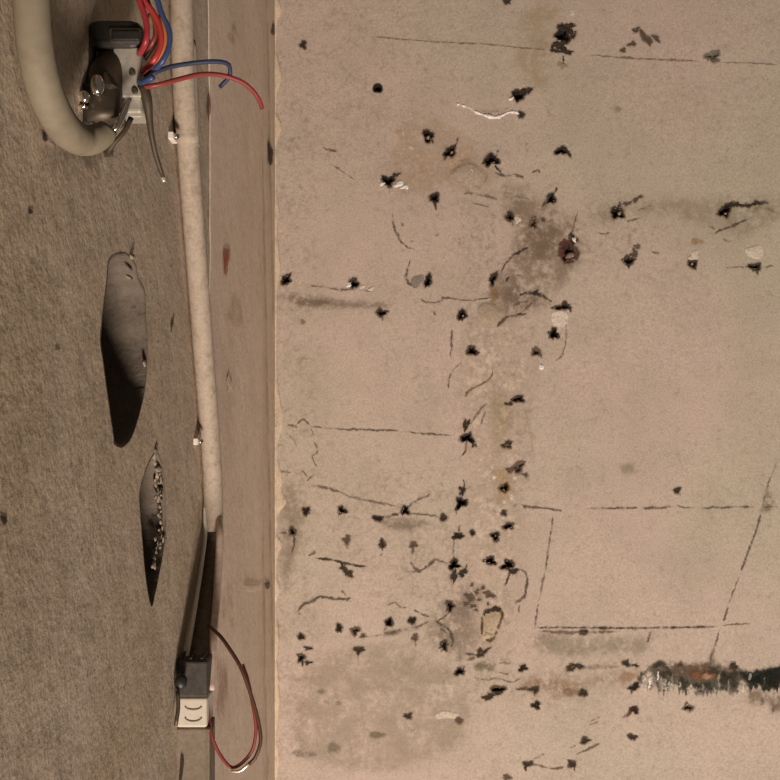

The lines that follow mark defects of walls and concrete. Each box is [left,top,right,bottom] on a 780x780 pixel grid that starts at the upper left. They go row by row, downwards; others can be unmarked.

leakage [457,103,519,119]
crack [392,222,488,315]
crack [497,247,552,327]
spalling [745,245,763,274]
spalling [100,252,148,448]
crack [282,419,449,517]
spalling [139,443,167,607]
crack [298,591,350,611]
crack [309,551,366,568]
flaking render [445,583,504,676]
crack [516,569,529,610]